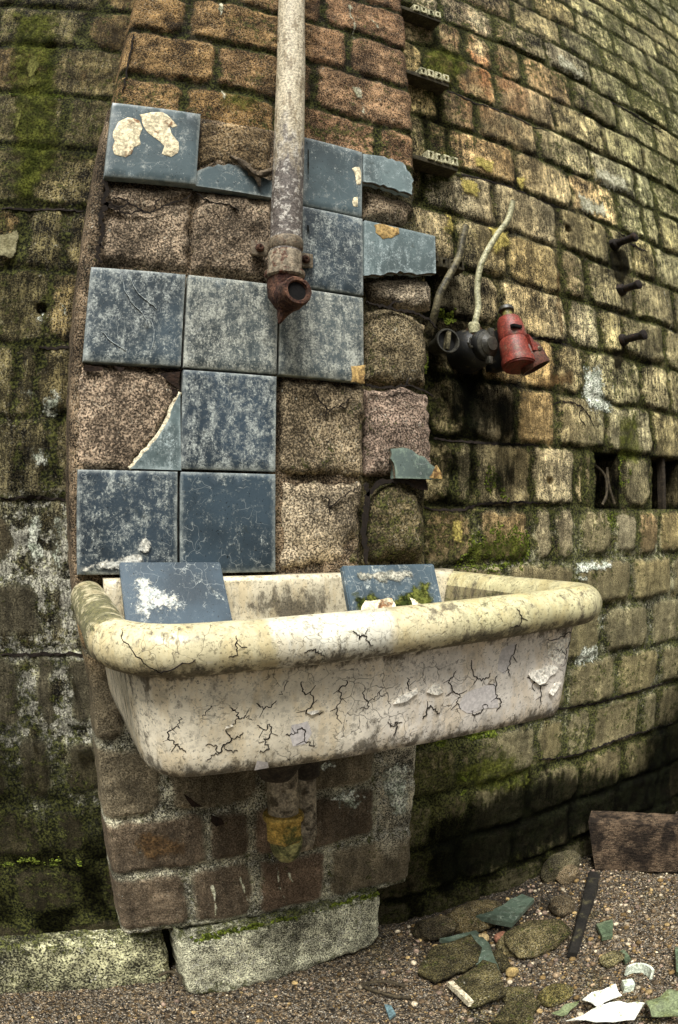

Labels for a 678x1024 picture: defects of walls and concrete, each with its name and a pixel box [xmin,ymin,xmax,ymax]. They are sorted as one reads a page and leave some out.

peeling [112,112,179,157]
peeling [101,187,271,282]
corrosion [277,307,292,324]
peeling [76,365,182,471]
damp [583,366,614,421]
damp [27,516,61,568]
damp [77,747,93,764]
damp [430,716,675,891]